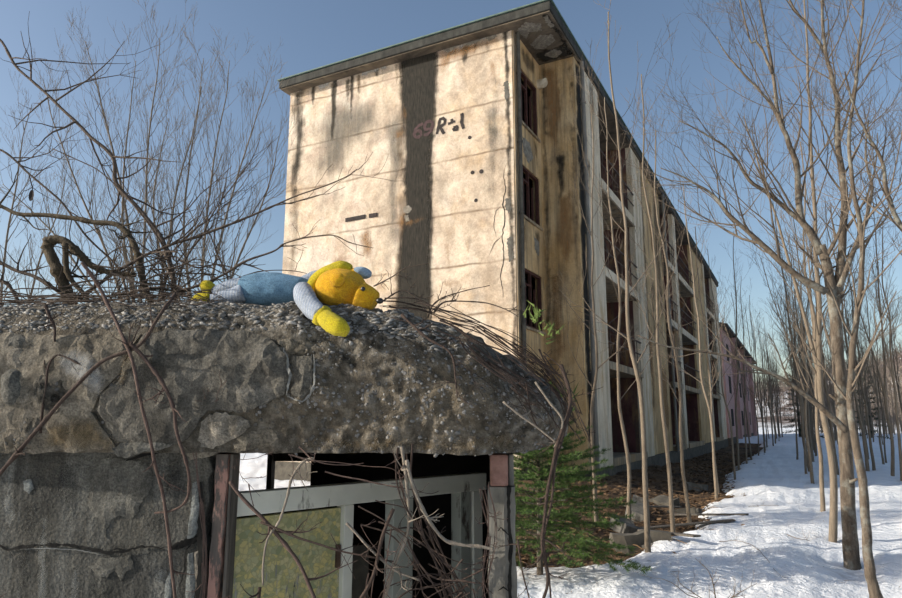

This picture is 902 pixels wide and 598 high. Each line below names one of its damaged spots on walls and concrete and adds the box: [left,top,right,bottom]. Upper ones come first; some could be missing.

leakage [293,86,315,192]
leakage [326,76,364,165]
leakage [391,52,438,320]
rust [546,70,560,141]
flaking render [0,328,313,539]
crack [0,482,204,598]
flaking render [164,573,172,598]
flaking render [185,551,198,598]